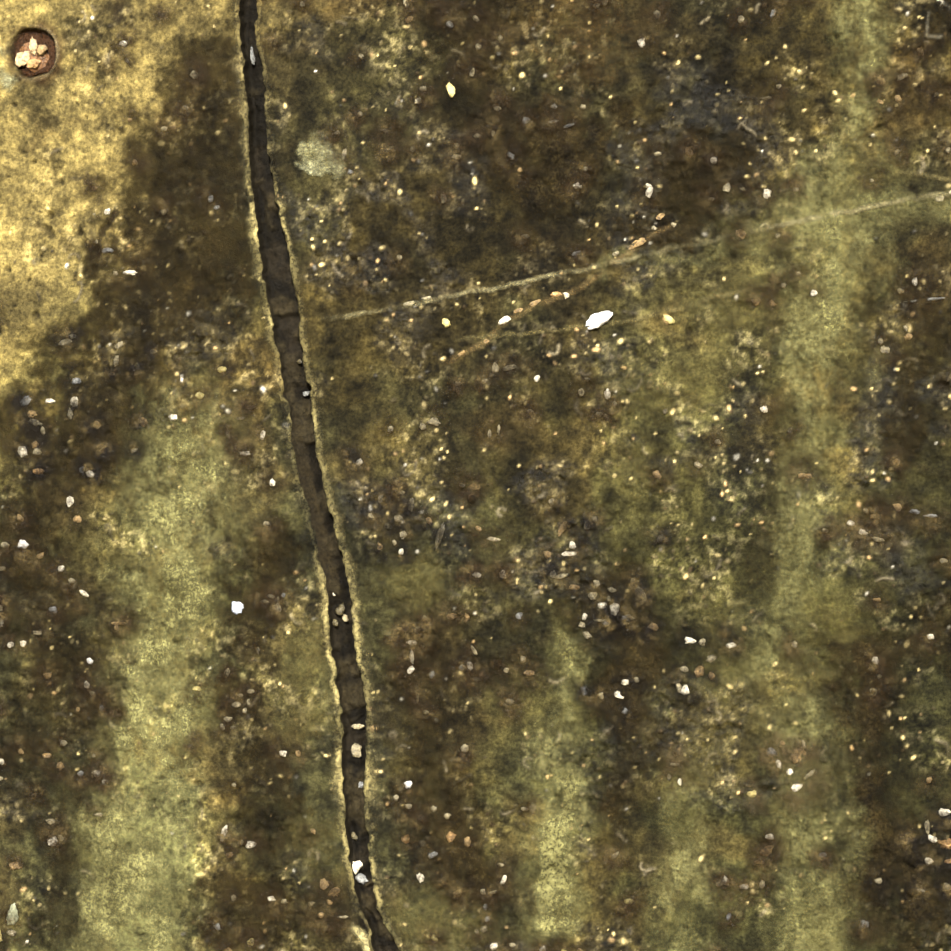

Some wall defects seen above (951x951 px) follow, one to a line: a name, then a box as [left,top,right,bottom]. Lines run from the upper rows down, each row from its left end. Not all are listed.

leakage [839,0,885,78]
leakage [833,96,871,159]
crack [612,213,676,263]
crack [780,200,901,226]
crack [931,190,951,202]
crack [403,296,431,306]
crack [456,266,592,356]
leakage [775,183,871,449]
leakage [0,20,310,951]
crack [230,0,410,951]
leakage [759,461,813,575]
leakage [781,591,951,951]